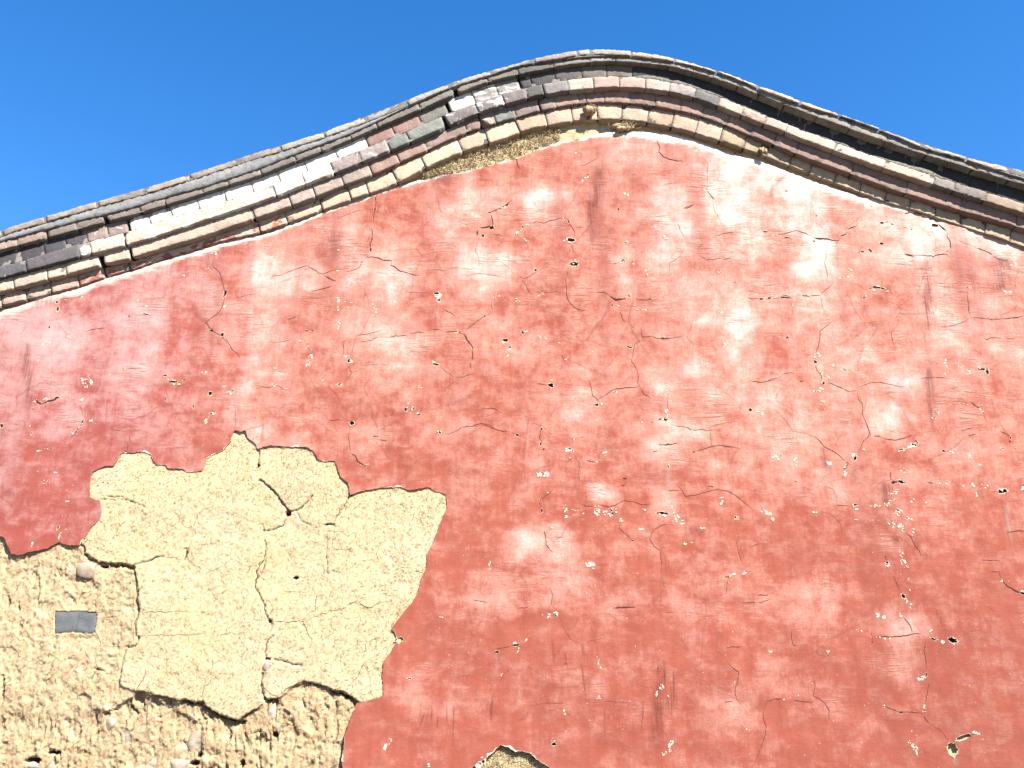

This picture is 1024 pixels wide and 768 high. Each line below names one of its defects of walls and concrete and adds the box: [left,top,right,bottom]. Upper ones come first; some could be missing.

crack [33,396,144,453]
crack [100,218,139,277]
crack [205,255,249,375]
crack [270,197,509,465]
crack [523,158,598,311]
crack [436,356,774,613]
crack [589,292,737,453]
crack [754,218,944,529]
crack [906,212,1017,267]
crack [76,456,390,723]
crack [856,555,945,735]
spalling [947,731,983,758]